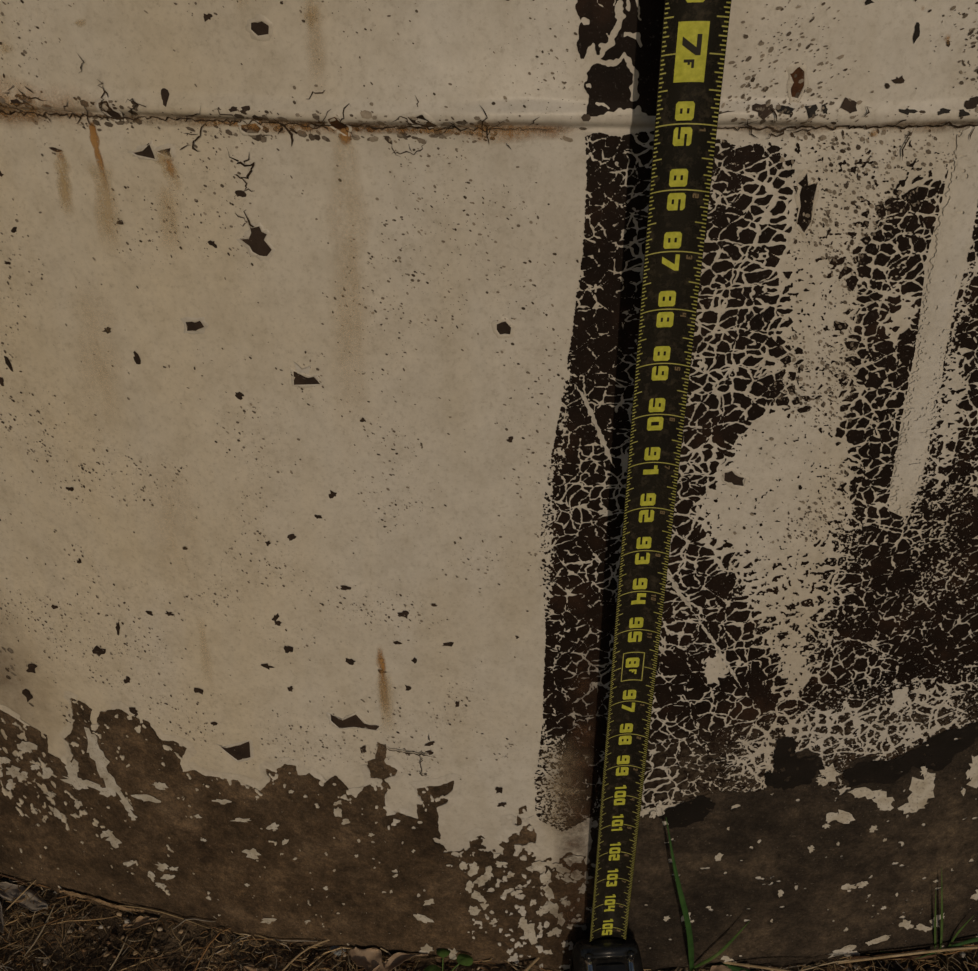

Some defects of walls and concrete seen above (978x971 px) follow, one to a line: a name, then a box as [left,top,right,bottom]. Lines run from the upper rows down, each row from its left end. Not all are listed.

rust [89,114,288,224]
rust [300,122,449,143]
peeling [0,131,654,971]
peeling [627,136,978,971]
rust [378,652,388,704]